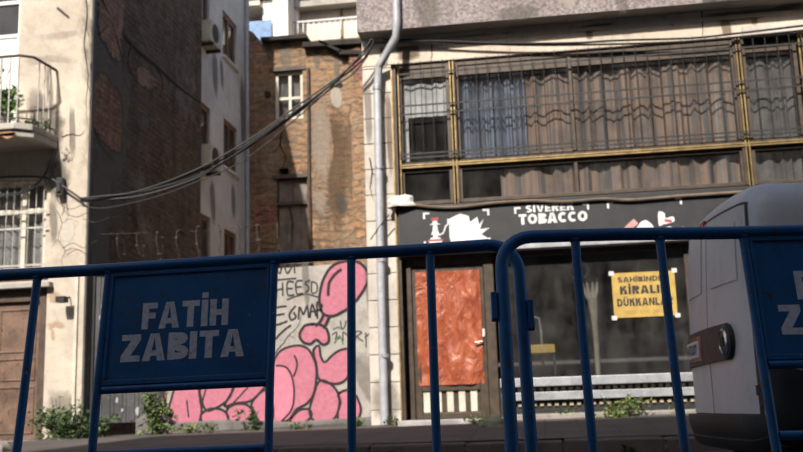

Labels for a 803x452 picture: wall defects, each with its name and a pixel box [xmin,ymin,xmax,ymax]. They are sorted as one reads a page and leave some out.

flaking render [97,0,127,63]
spalling [0,130,16,139]
flaking render [89,63,123,164]
damp [329,115,352,221]